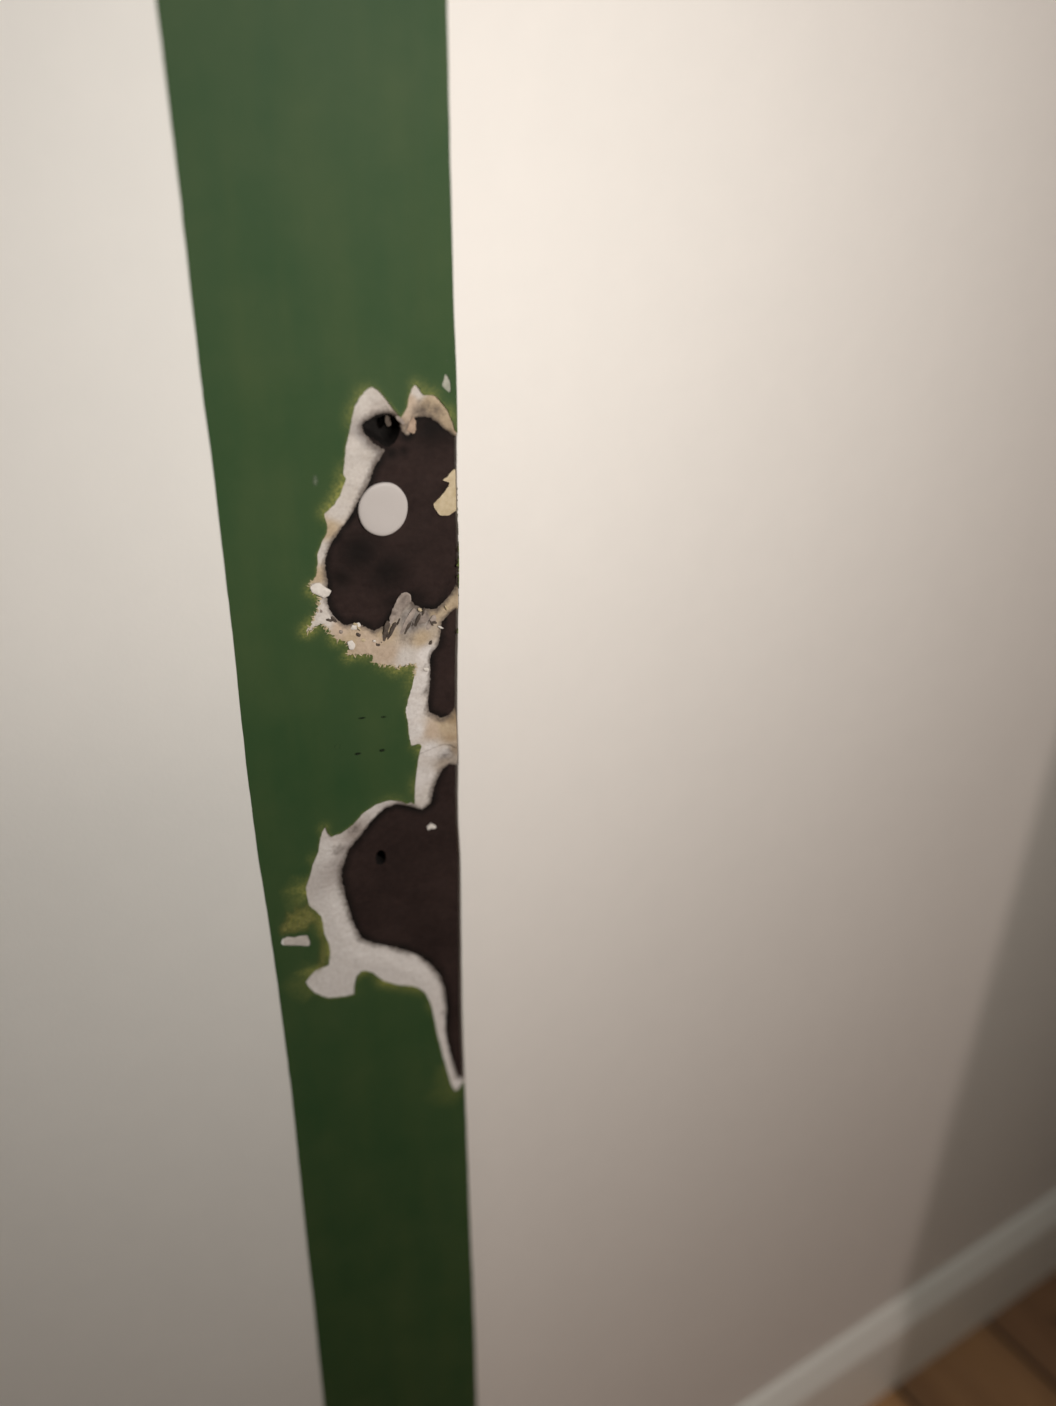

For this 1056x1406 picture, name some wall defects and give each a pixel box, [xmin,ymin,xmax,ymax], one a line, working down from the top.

peeling [433,469,456,516]
peeling [283,907,324,964]